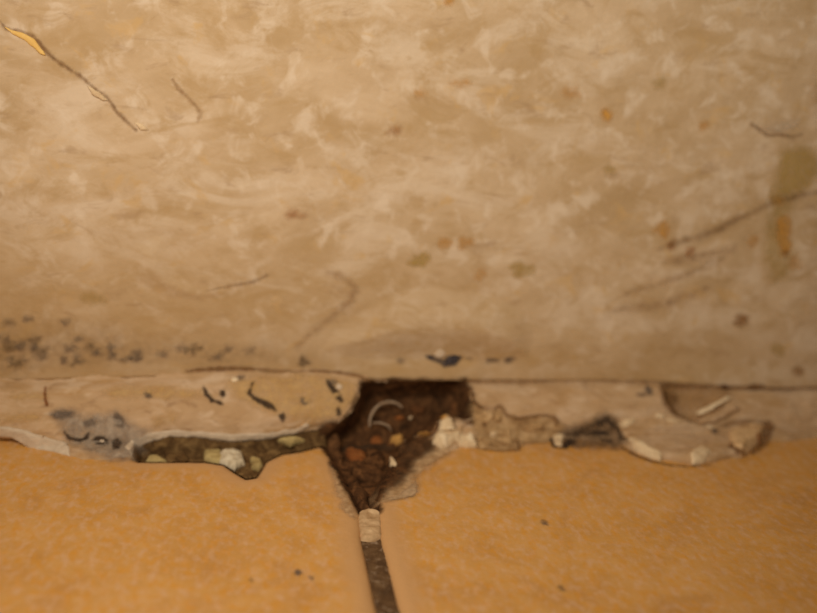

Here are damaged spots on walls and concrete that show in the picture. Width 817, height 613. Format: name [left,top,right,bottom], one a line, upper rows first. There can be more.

crack [5,27,54,59]
spalling [662,385,740,425]
spalling [231,375,565,513]